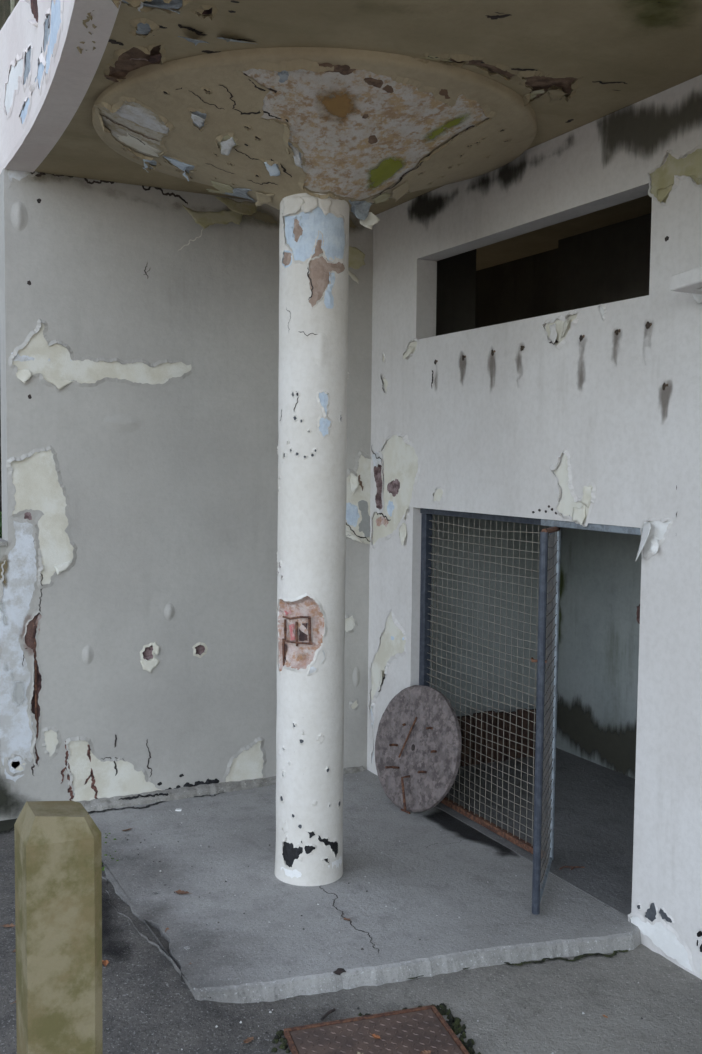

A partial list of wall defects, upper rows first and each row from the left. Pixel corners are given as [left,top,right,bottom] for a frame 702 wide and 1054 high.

crack [176,73,288,122]
water stain [598,94,702,162]
crack [205,148,292,185]
peeling [206,58,497,309]
water stain [408,192,457,220]
water stain [472,158,537,190]
peeling [8,318,195,392]
peeling [0,446,166,801]
water stain [557,698,637,776]
spalling [280,794,342,878]
crack [319,886,379,953]
peeling [628,900,702,975]